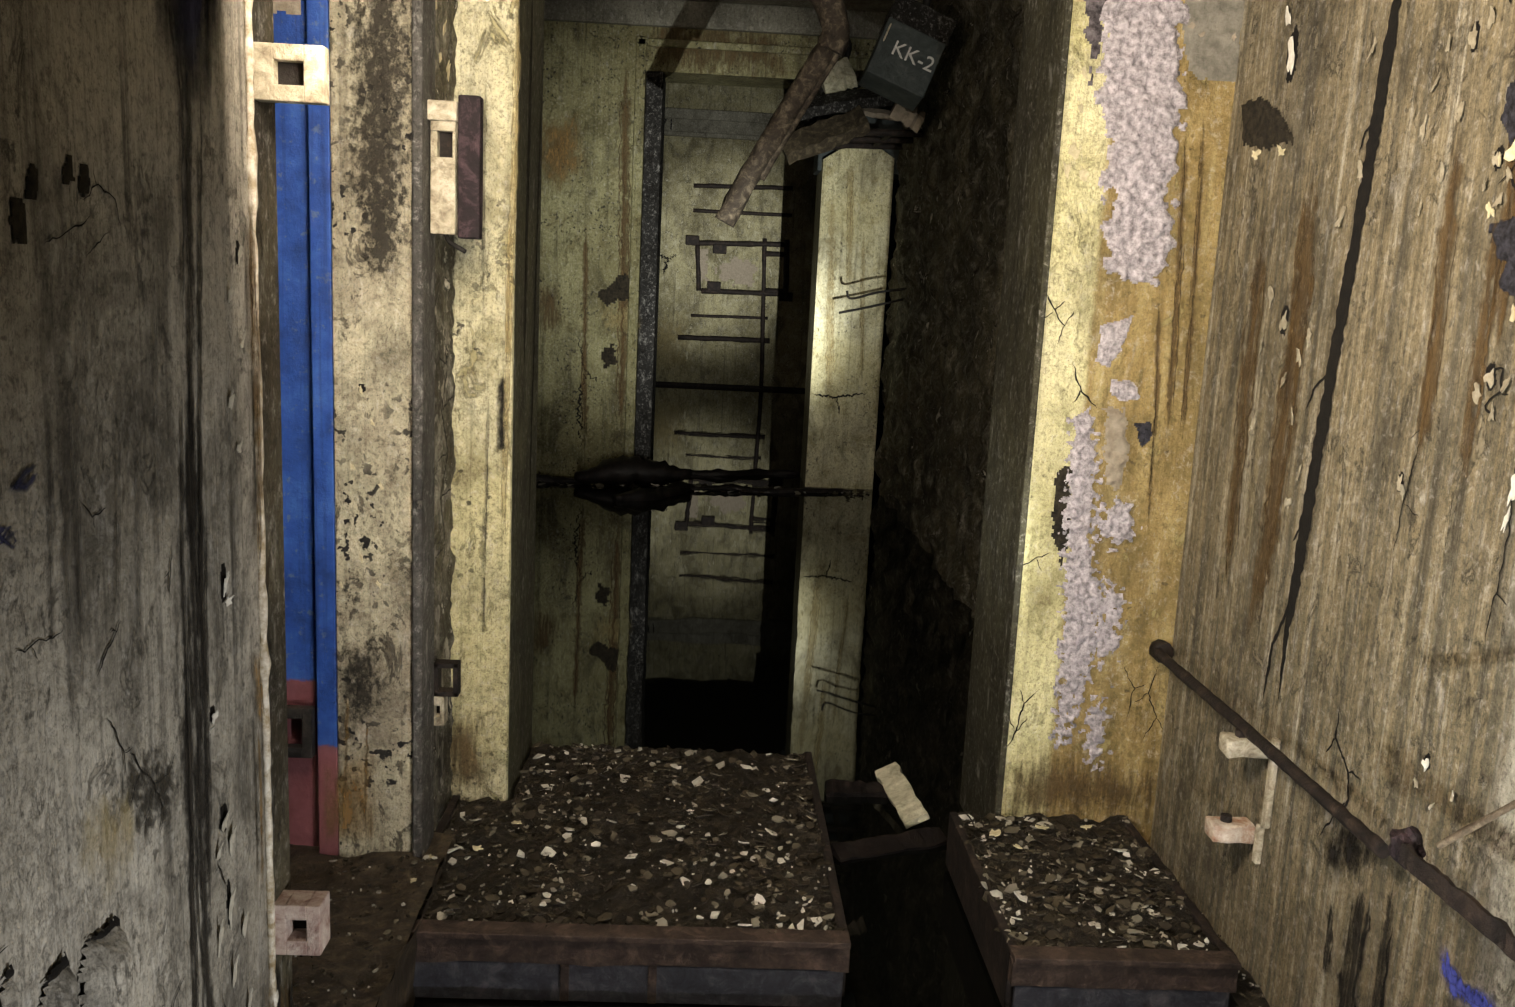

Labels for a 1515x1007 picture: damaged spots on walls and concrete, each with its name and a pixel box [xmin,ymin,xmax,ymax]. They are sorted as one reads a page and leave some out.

corrosion [653,27,784,76]
peeling [1285,6,1299,83]
hole [8,163,38,244]
hole [62,154,91,198]
corrosion [618,79,631,276]
peeling [1063,0,1245,287]
spalling [1241,96,1294,160]
spalling [1482,79,1515,322]
corrosion [581,232,589,442]
corrosion [615,299,628,425]
peeling [1048,315,1152,776]
peeling [1500,468,1515,533]